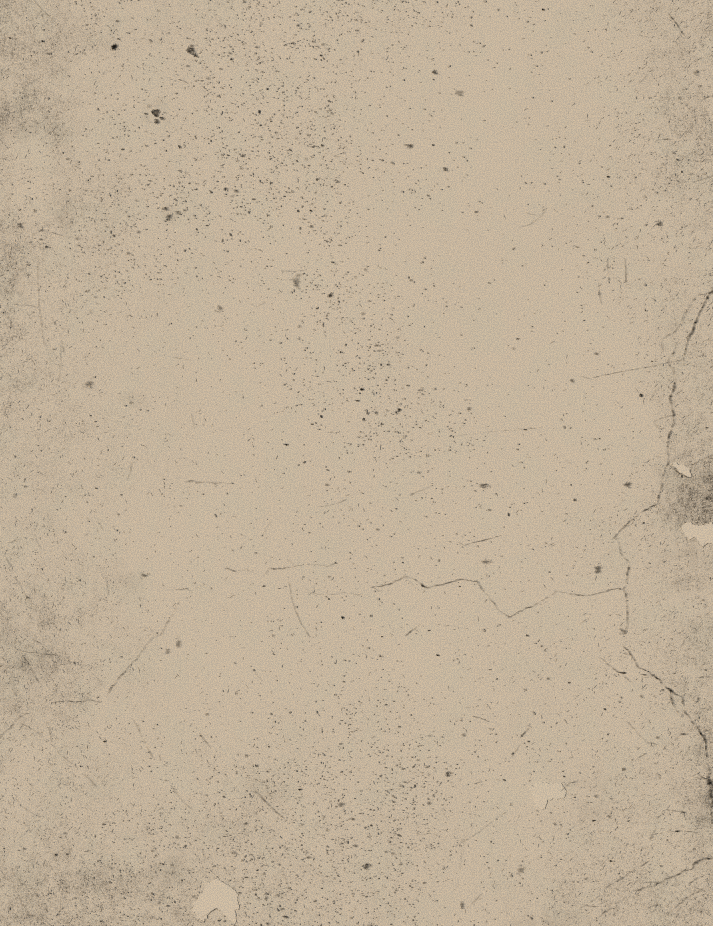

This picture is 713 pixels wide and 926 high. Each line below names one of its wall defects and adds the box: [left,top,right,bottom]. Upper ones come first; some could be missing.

peeling [681,522,713,547]
crack [618,647,713,822]
peeling [193,878,240,926]